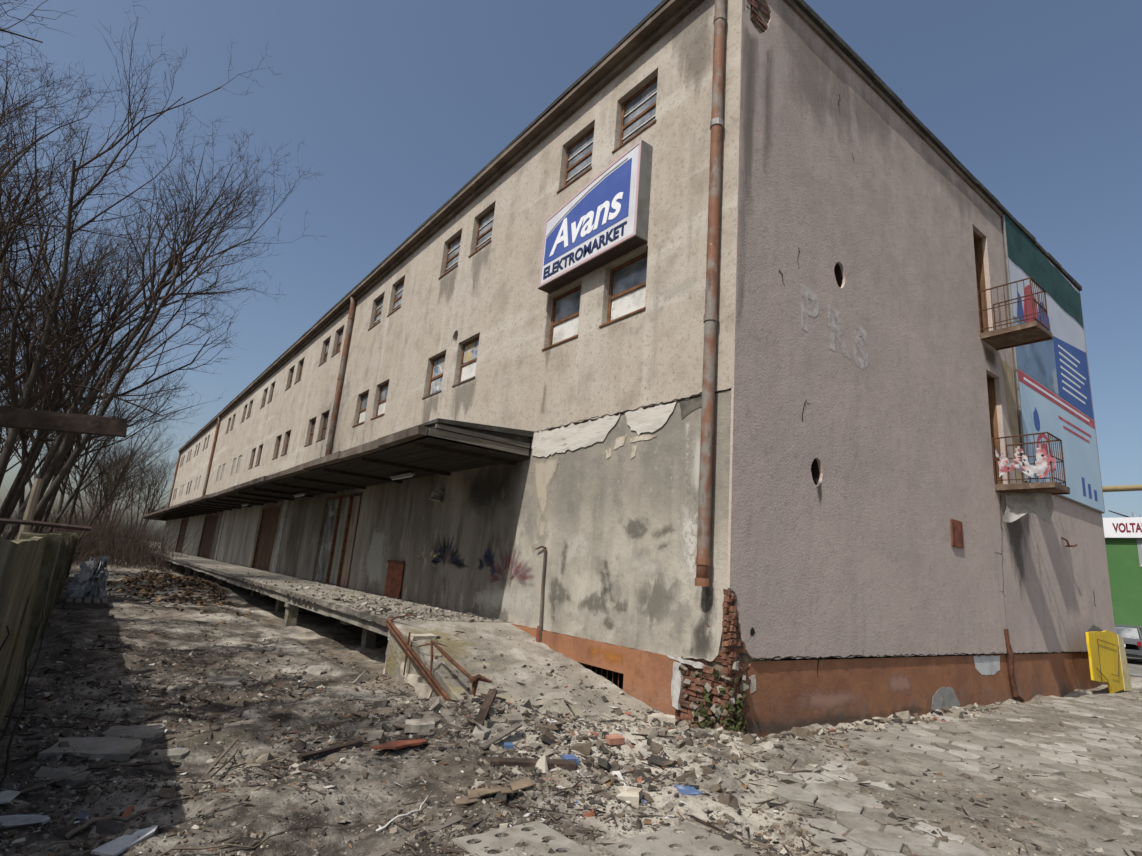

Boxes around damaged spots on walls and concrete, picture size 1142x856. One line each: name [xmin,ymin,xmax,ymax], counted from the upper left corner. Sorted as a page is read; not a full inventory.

spalling [746,0,770,34]
peeling [532,396,702,537]
leakage [475,585,537,618]
leakage [550,532,593,613]
leakage [583,562,636,632]
leakage [627,505,713,654]
spalling [667,589,756,734]
peeling [973,655,1000,676]